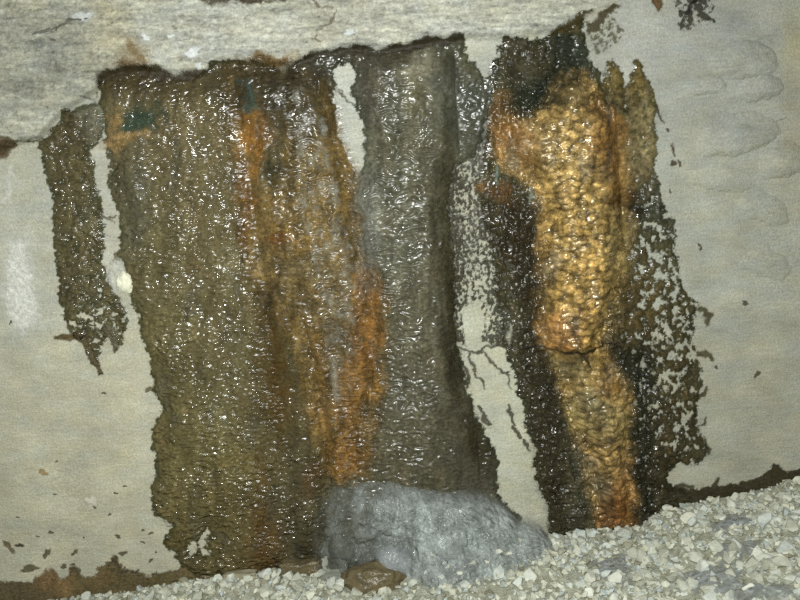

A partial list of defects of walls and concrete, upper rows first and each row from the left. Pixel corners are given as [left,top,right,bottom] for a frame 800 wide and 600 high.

rust [225,51,389,483]
water stain [481,306,512,348]
rust [490,69,638,528]
water stain [697,306,713,326]
crack [457,345,529,451]
water stain [673,463,800,504]